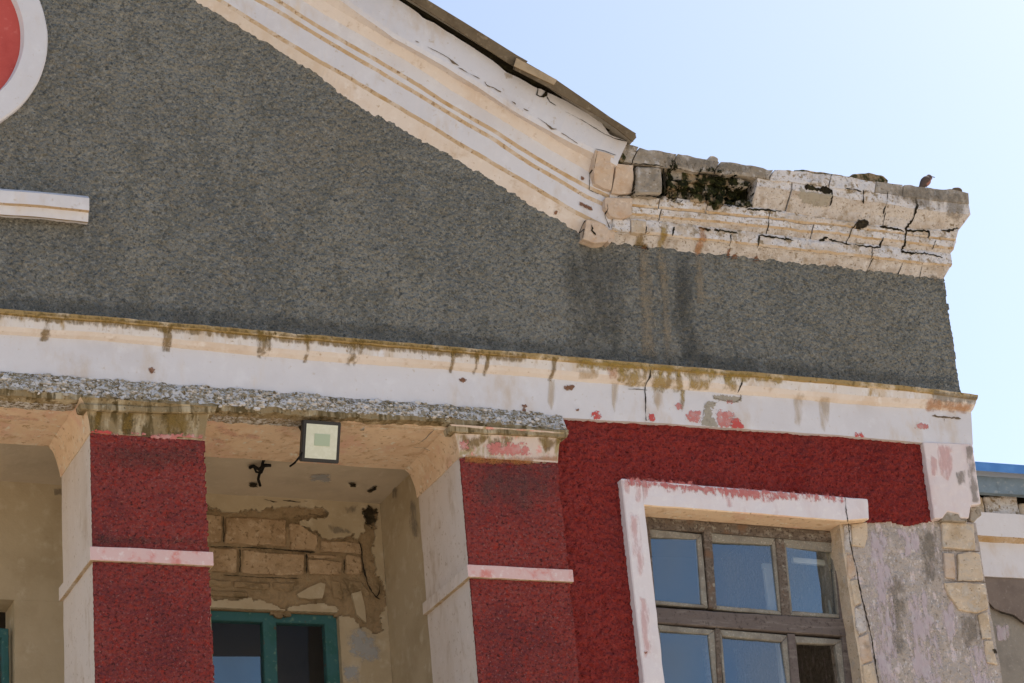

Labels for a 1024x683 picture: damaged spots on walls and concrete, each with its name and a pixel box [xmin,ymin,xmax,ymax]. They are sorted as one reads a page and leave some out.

crack [416,41,666,238]
crack [819,188,958,279]
water stain [0,313,526,375]
water stain [577,253,782,407]
peeling [487,442,531,456]
crack [636,368,652,421]
peeling [675,395,744,429]
peeling [627,478,843,502]
peeling [206,507,386,634]
crack [844,496,879,683]